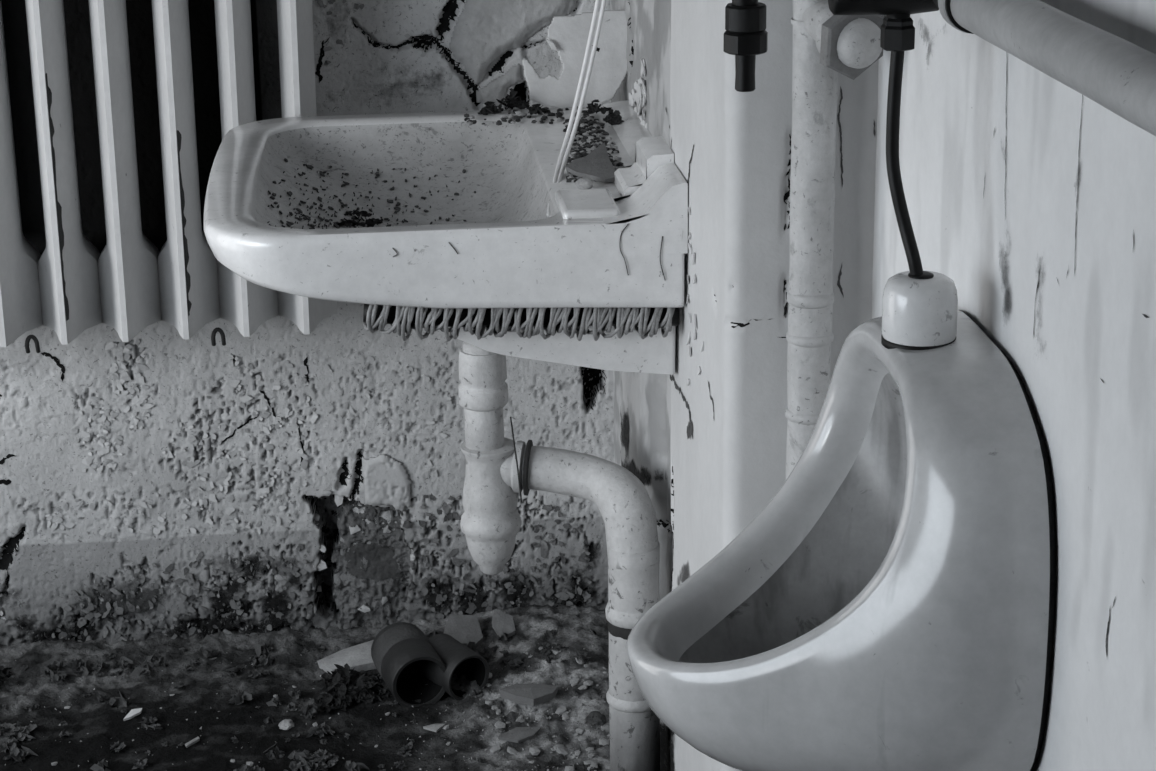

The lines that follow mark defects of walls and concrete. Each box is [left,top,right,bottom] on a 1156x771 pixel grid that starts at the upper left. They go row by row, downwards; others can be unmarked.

crack [315,0,542,107]
peeling [684,232,704,386]
spalling [580,366,611,415]
crack [0,454,15,485]
crack [339,451,364,502]
crack [0,526,26,597]